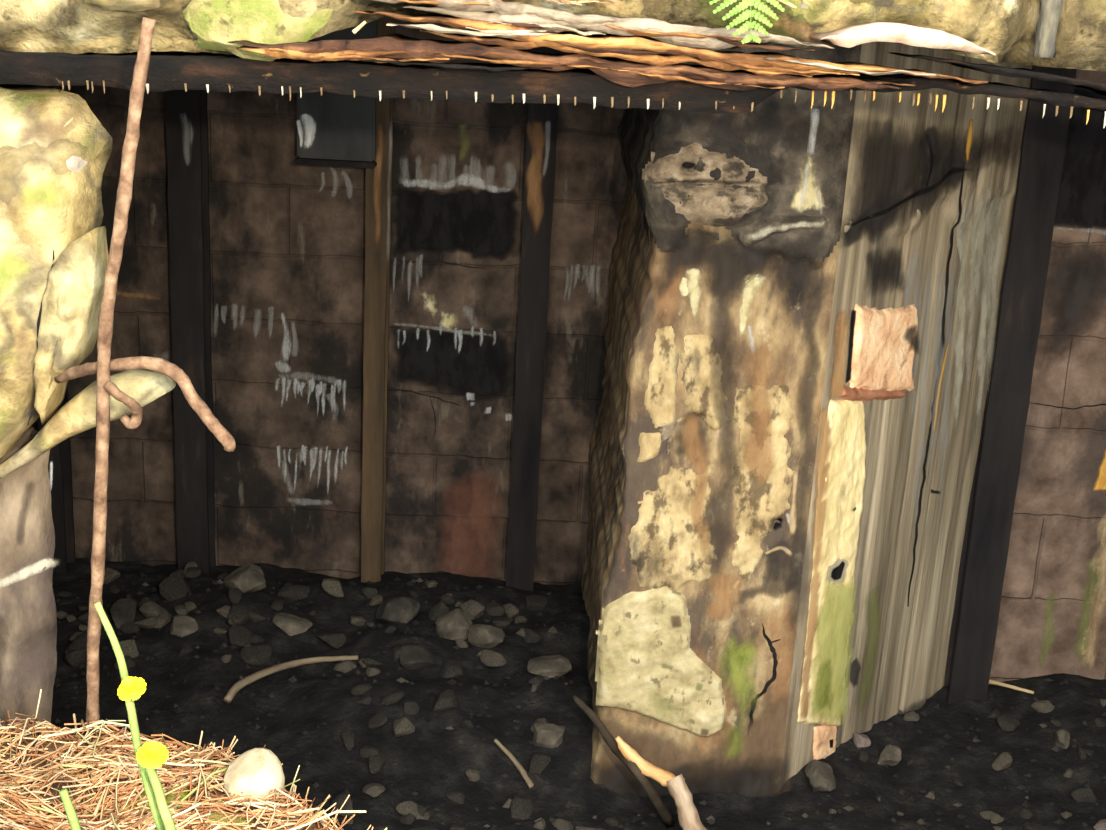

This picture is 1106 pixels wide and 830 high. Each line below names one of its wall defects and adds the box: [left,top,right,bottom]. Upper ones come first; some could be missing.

leakage [424,294,454,329]
flaking render [595,326,797,737]
crack [748,624,780,731]
flaking render [797,304,919,760]
crack [843,129,966,607]